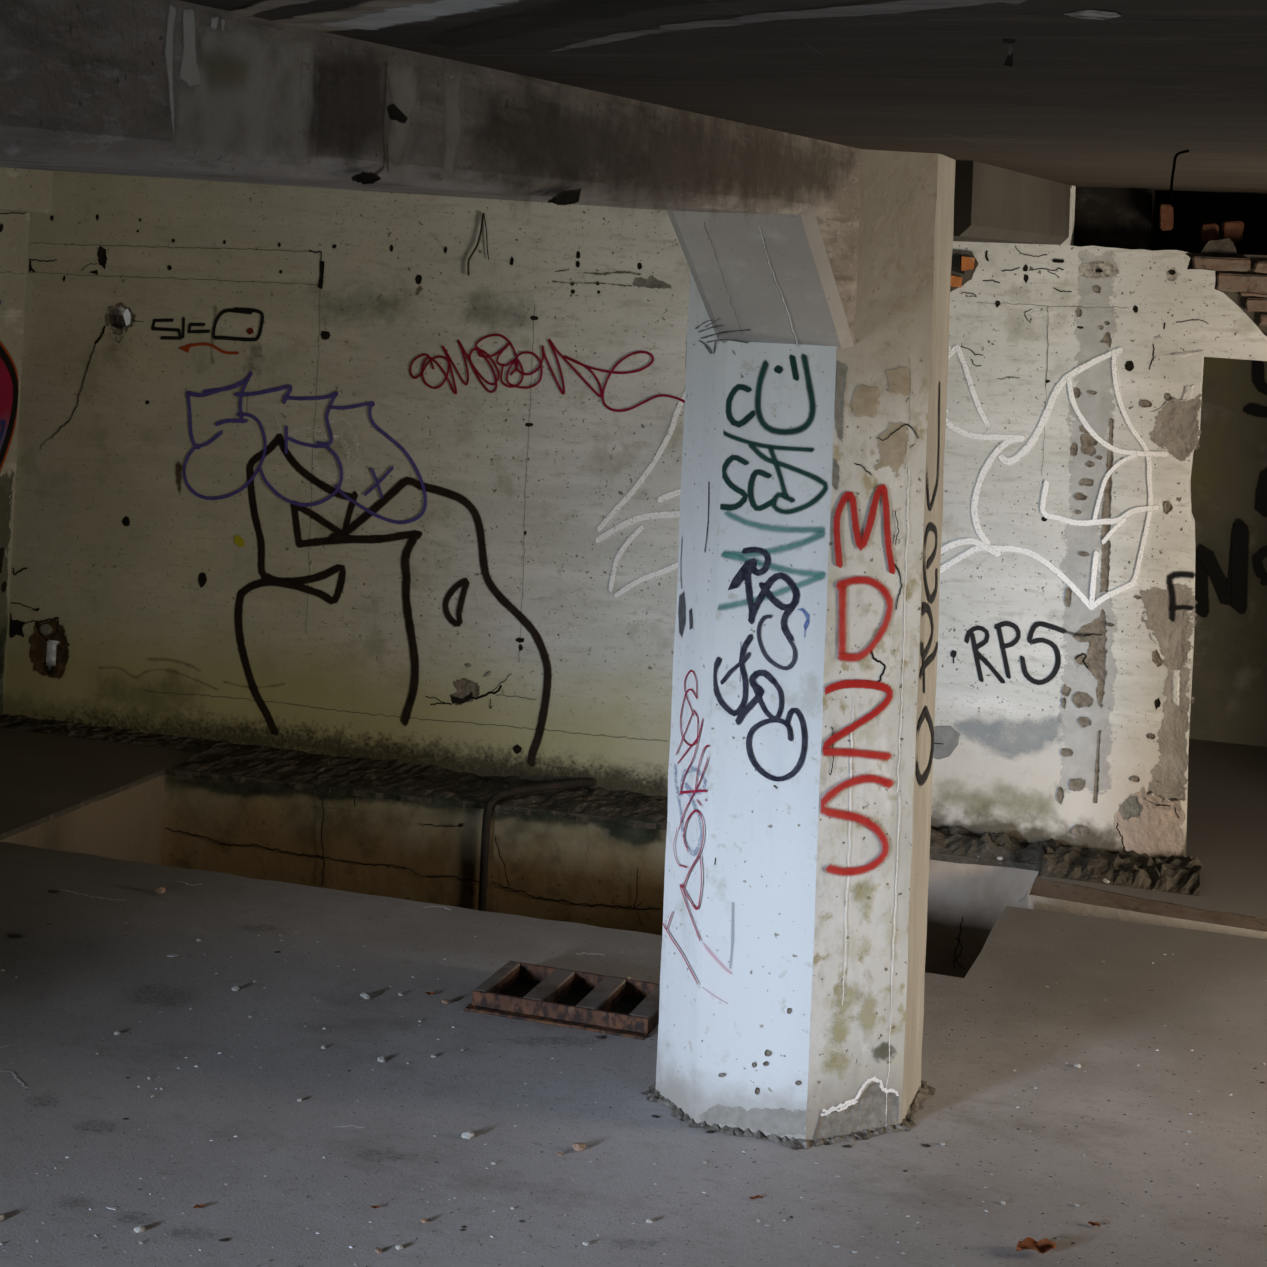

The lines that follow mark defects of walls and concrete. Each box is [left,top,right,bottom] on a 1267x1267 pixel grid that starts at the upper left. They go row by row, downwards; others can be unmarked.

spalling [951,255,965,274]
spalling [835,360,911,443]
spalling [874,422,909,478]
flaking render [1140,384,1203,461]
spalling [9,613,70,679]
spalling [425,663,535,709]
water stain [50,712,664,796]
spalling [1071,825,1089,837]
spalling [700,1082,899,1139]